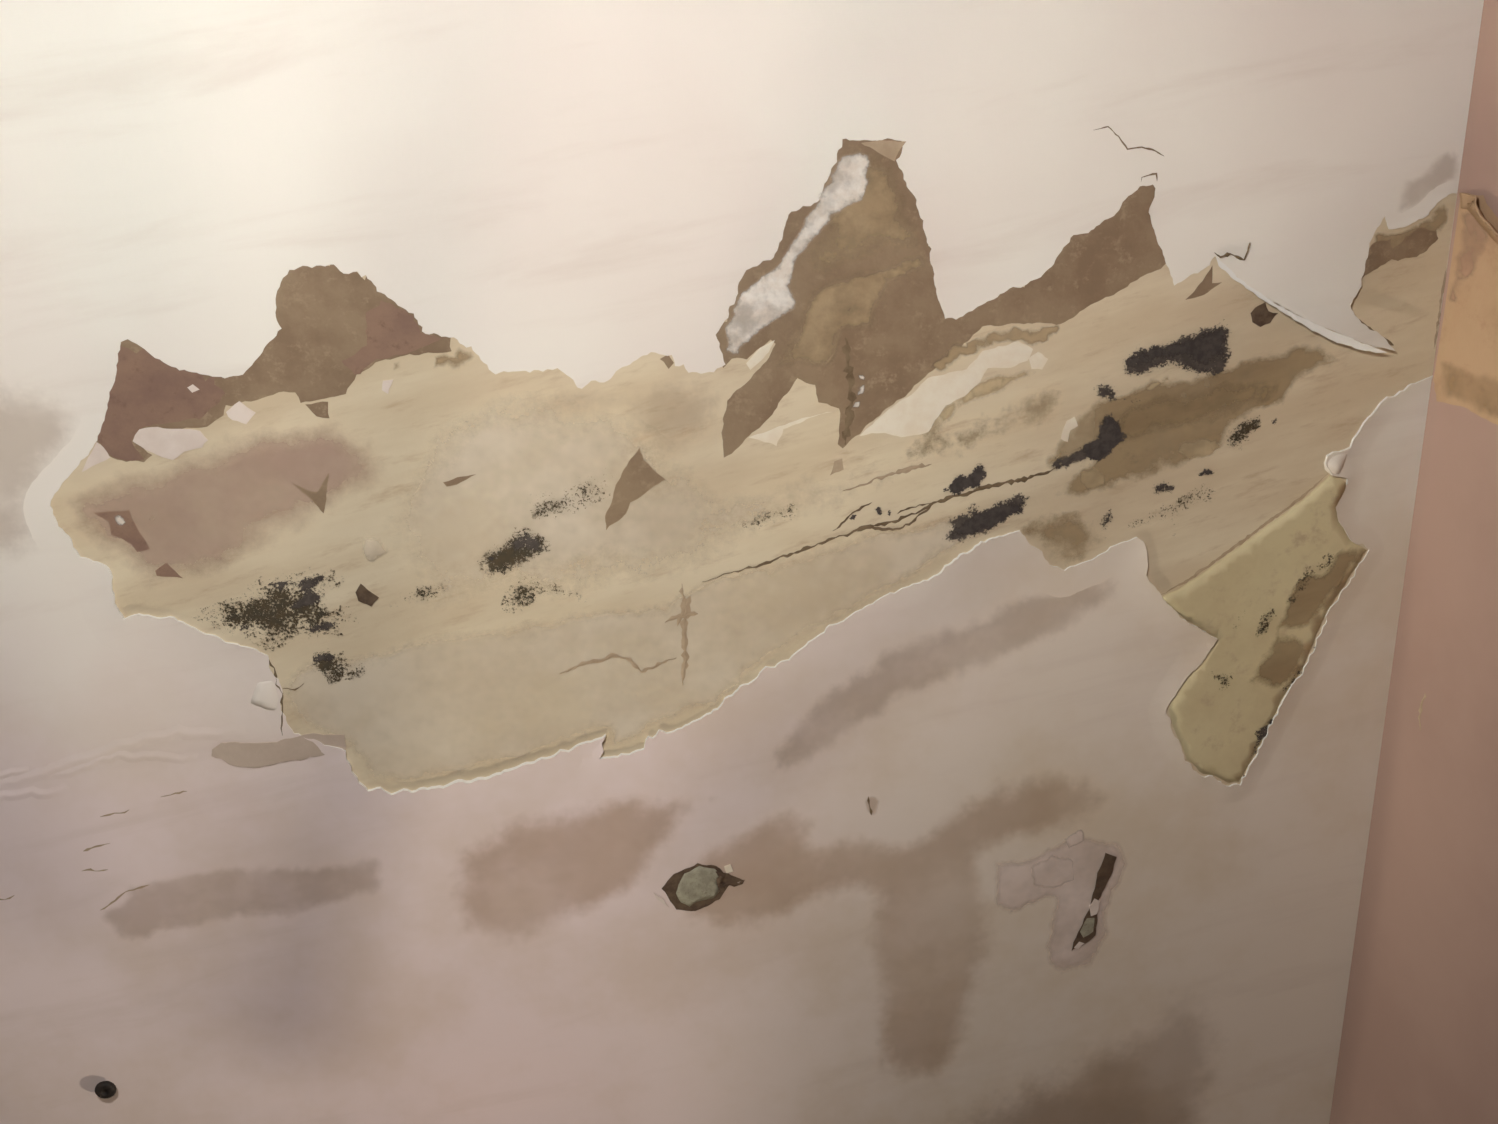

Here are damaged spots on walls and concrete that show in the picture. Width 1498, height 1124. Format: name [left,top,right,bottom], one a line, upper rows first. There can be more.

crack [1095,126,1164,181]
damp [1124,319,1232,377]
damp [1052,384,1140,469]
damp [1227,415,1277,446]
peeling [18,113,1498,840]
crack [560,463,1056,685]
damp [197,570,379,684]
spalling [654,863,744,911]
spalling [1072,853,1117,950]